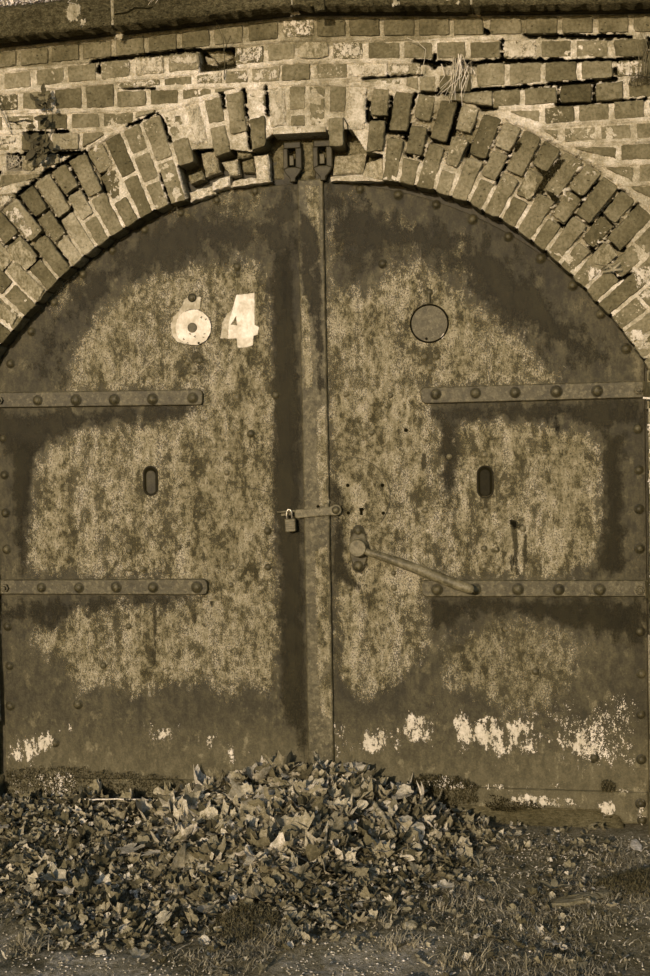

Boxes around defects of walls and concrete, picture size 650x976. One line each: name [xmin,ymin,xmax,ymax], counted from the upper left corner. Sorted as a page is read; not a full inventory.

spalling [205,49,236,68]
corrosion [509,519,528,576]
peeling [9,725,72,766]
peeling [453,694,635,770]